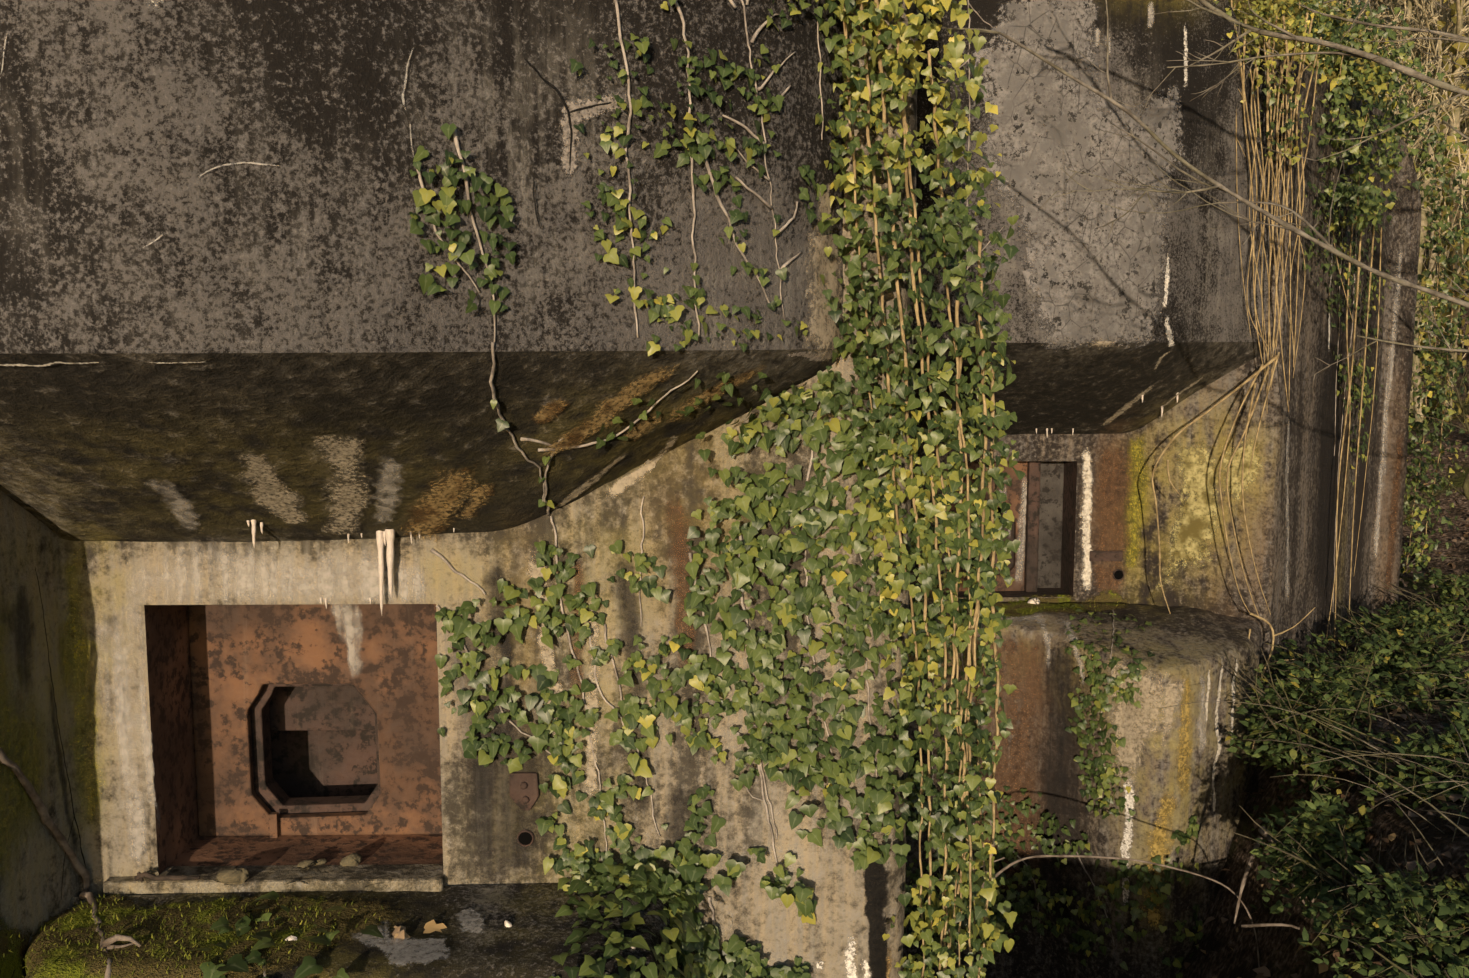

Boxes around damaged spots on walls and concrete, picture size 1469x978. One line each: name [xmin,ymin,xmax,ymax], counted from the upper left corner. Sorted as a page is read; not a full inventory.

leakage [1127,443,1146,566]
leakage [1313,312,1341,590]
leakage [1382,320,1396,451]
leakage [223,556,420,668]
leakage [1112,663,1238,905]